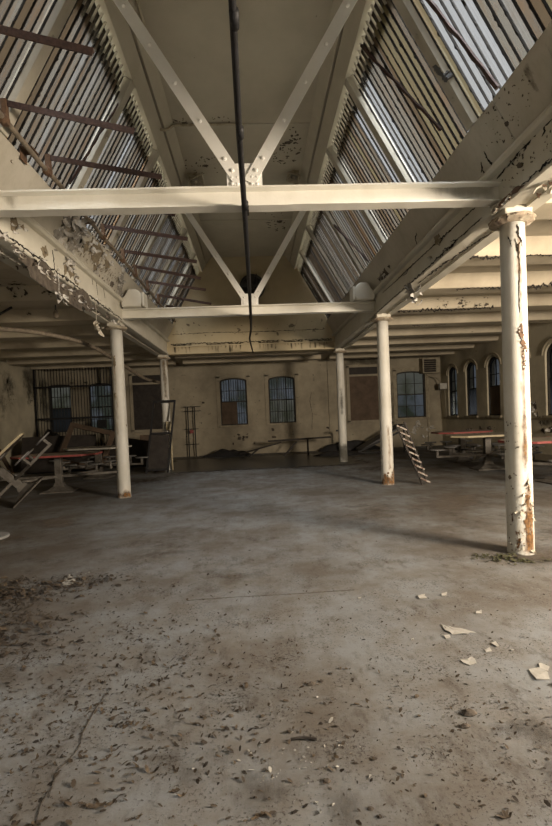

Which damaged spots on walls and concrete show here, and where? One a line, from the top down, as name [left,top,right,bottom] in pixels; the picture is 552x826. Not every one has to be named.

peeling [488,130,551,215]
peeling [0,216,126,337]
peeling [403,254,461,305]
peeling [517,323,530,370]
peeling [506,473,537,554]
corrosion [526,485,534,551]
crack [36,689,110,821]